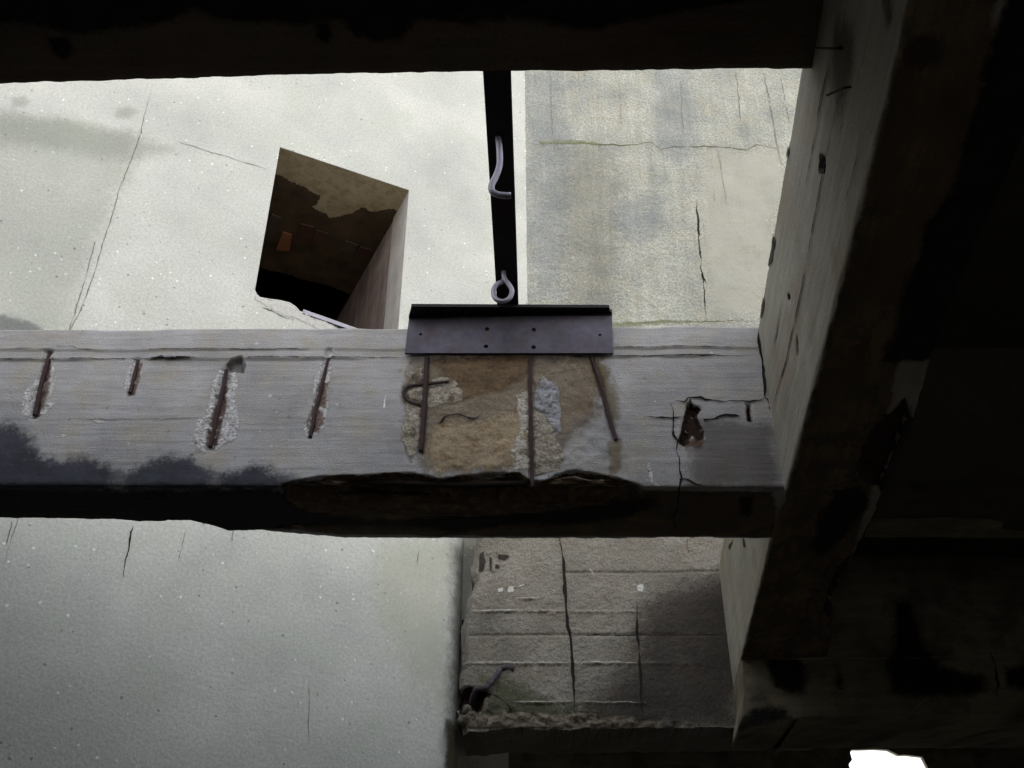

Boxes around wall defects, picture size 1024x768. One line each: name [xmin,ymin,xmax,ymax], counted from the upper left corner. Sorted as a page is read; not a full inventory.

crack [0,96,398,360]
crack [531,68,836,551]
spalling [21,351,56,418]
rust [38,366,50,415]
leakage [0,425,303,495]
rust [206,386,227,447]
spalling [192,355,246,453]
rust [308,379,328,432]
spalling [281,349,638,517]
rust [407,355,618,474]
spalling [678,406,704,447]
crack [559,538,666,714]